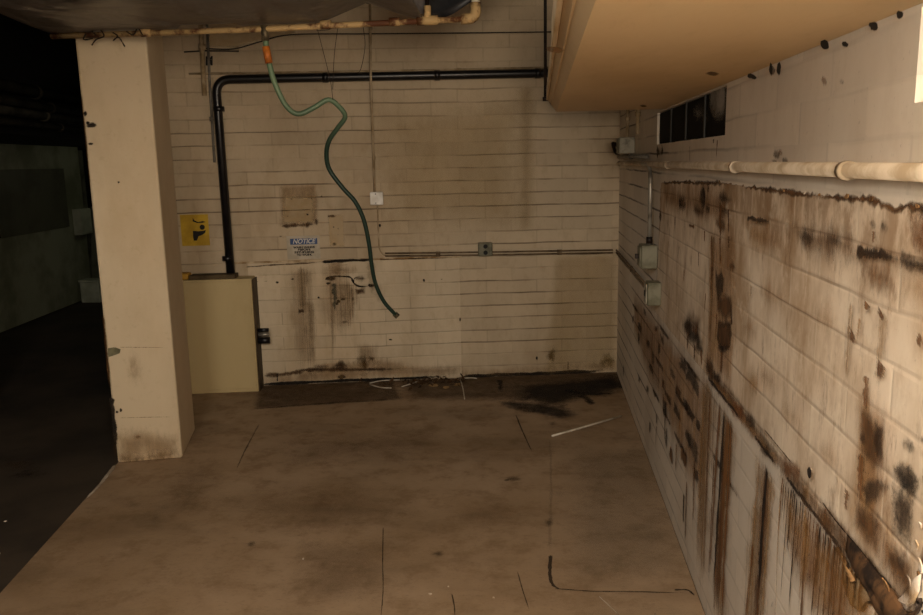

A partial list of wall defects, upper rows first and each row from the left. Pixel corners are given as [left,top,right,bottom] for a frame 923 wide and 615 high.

leakage [259,357,613,407]
rust [697,385,733,614]
rust [704,236,734,374]
peeling [655,180,923,597]
rust [745,466,867,615]
rust [844,301,888,550]